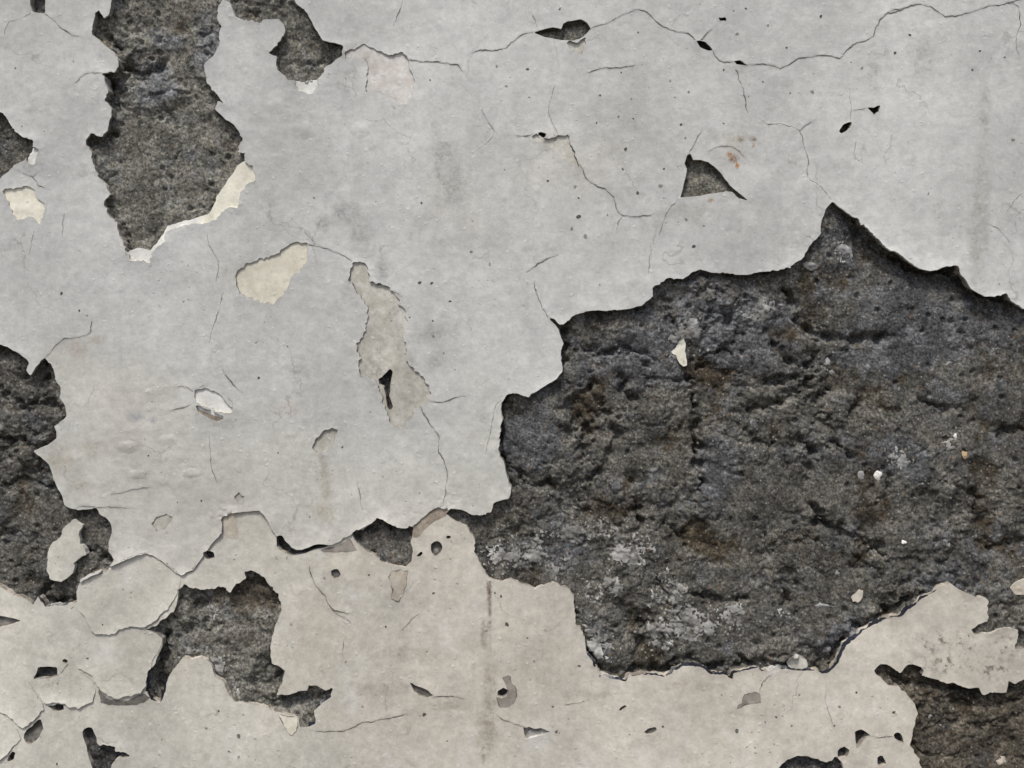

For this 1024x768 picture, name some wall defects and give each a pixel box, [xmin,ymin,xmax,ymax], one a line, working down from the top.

spalling [0,112,45,224]
spalling [86,0,415,263]
crack [409,15,537,71]
spalling [535,20,590,54]
crack [481,86,678,274]
spalling [681,155,746,200]
crack [592,0,1021,198]
spalling [0,345,114,607]
spalling [277,203,1024,682]
spalling [82,727,129,768]
spalling [98,570,333,736]
spalling [874,664,1024,768]